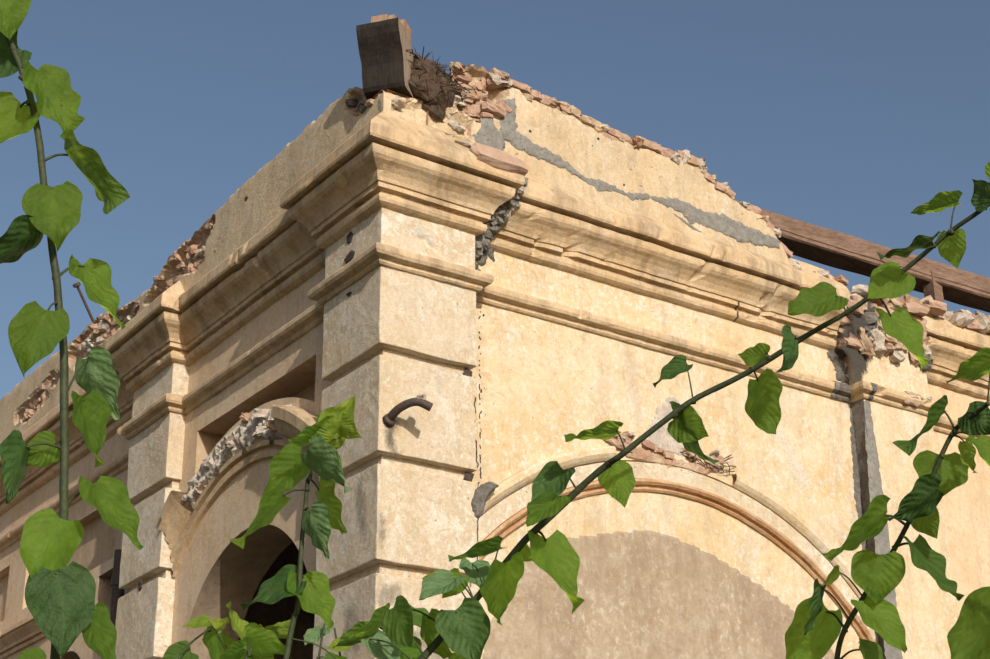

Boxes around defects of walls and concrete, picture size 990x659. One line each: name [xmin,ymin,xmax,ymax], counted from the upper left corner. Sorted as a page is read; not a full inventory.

spalling [345,88,378,116]
flaking render [391,62,529,271]
crack [472,98,781,249]
spalling [154,220,216,298]
spalling [70,300,140,361]
peeling [856,312,933,371]
spalling [15,371,60,424]
spalling [181,408,284,511]
spalling [604,397,736,475]